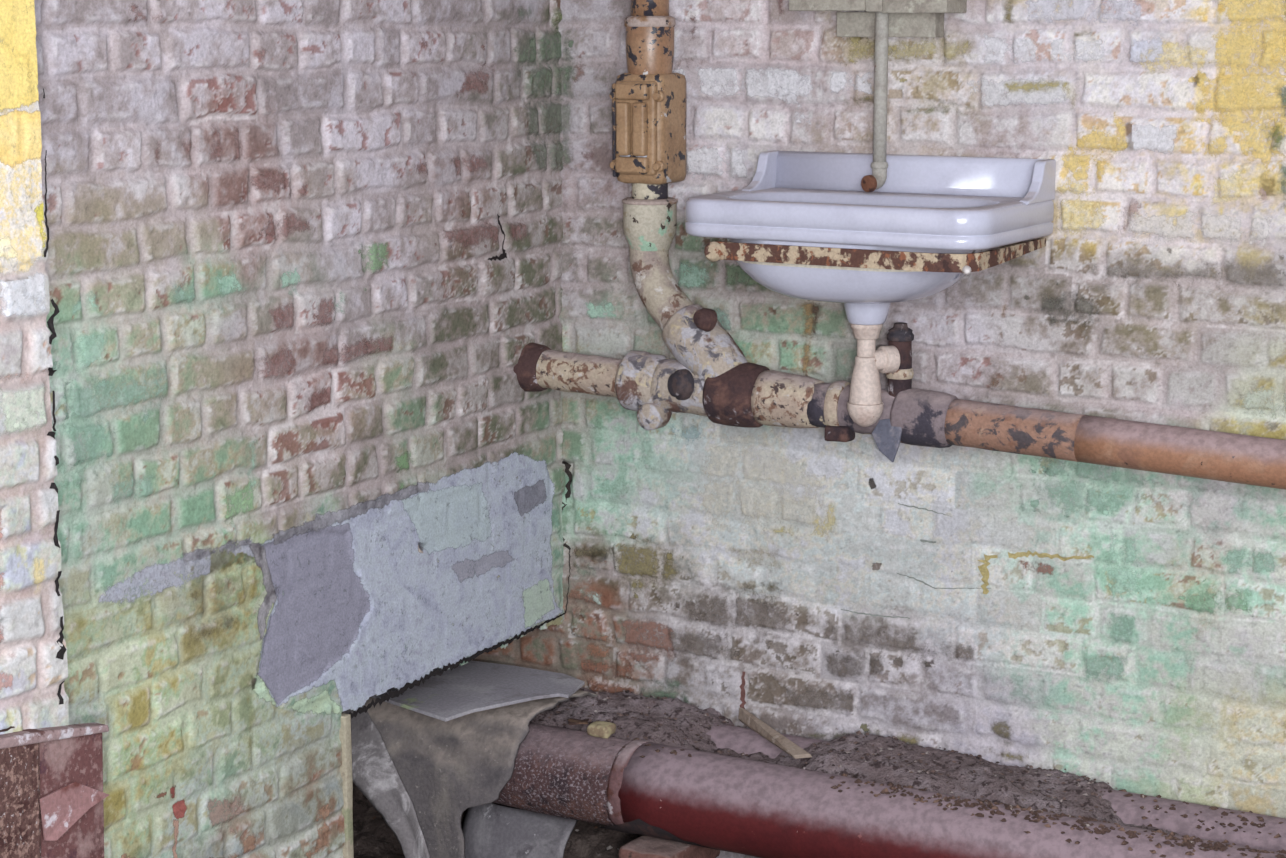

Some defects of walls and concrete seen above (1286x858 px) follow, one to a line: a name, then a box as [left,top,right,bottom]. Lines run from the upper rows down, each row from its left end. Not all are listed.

peeling [0,0,47,316]
peeling [99,452,595,714]
spalling [581,620,674,693]